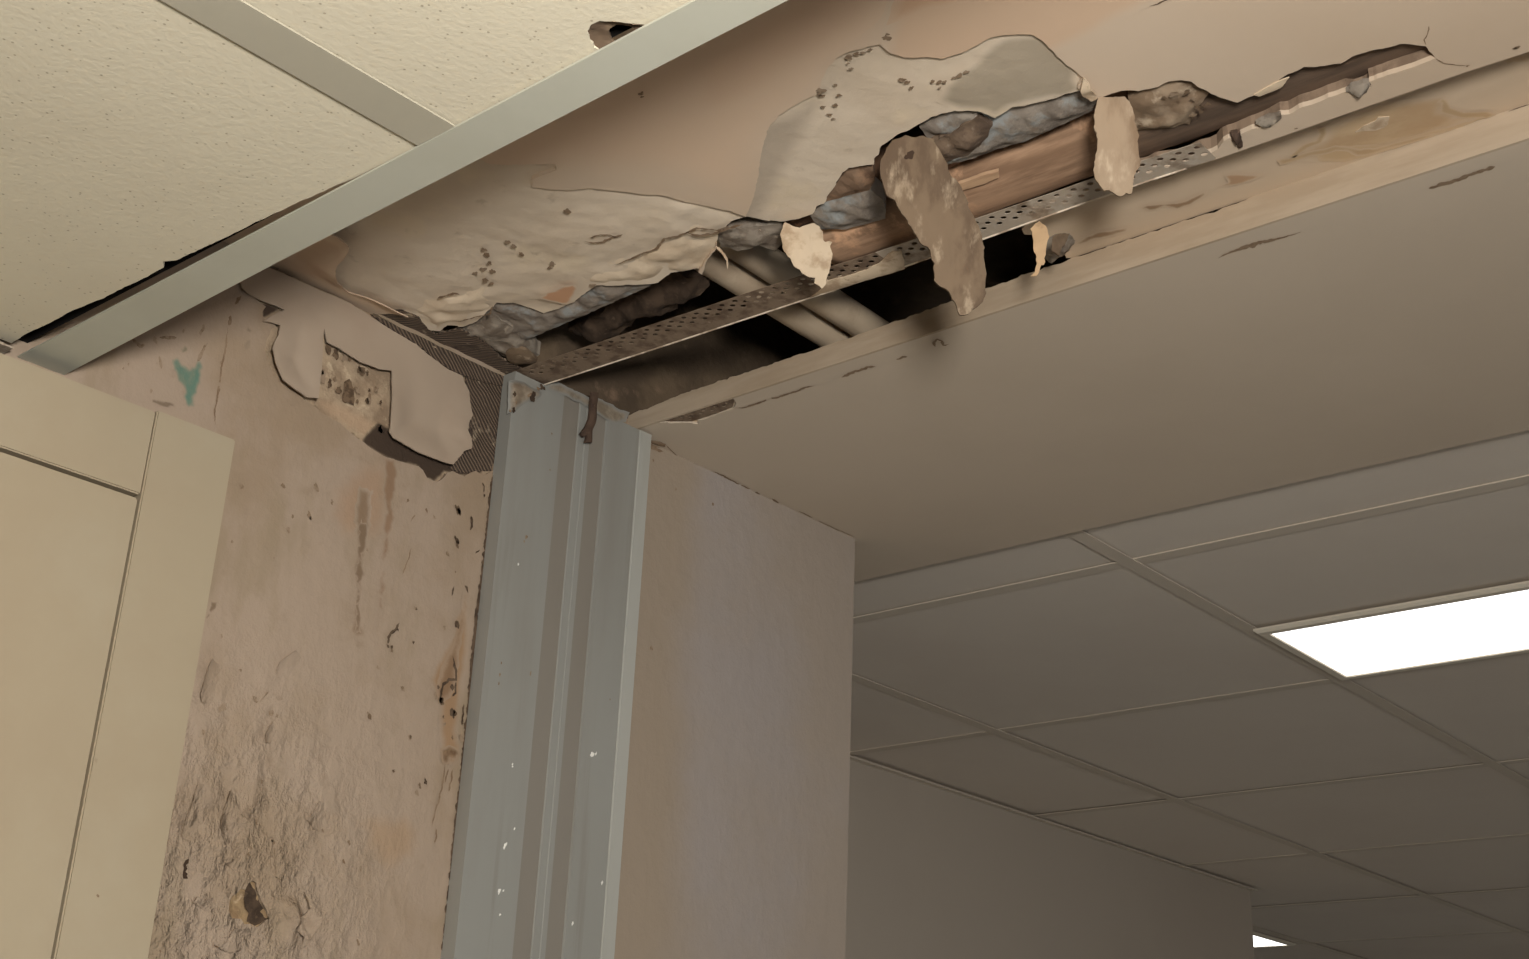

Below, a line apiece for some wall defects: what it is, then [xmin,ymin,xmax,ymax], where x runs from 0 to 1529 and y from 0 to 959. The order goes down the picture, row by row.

flaking render [1127,80,1211,130]
peeling [1254,77,1289,96]
leakage [1277,96,1529,166]
leakage [1504,52,1529,64]
peeling [240,33,1098,482]
leakage [320,456,397,546]
leakage [434,684,464,742]
flaking render [202,882,269,959]